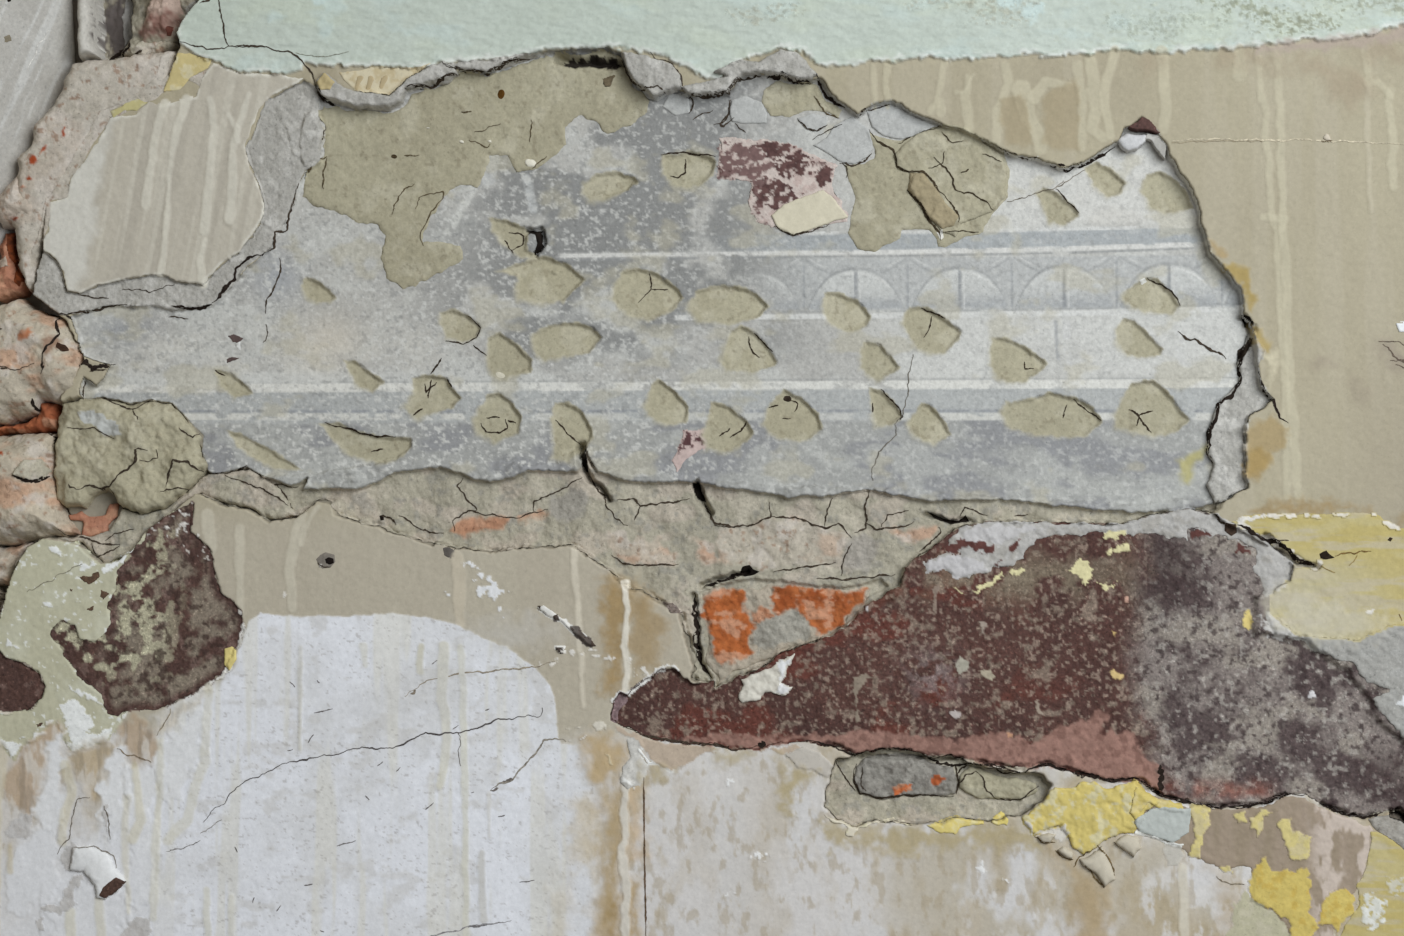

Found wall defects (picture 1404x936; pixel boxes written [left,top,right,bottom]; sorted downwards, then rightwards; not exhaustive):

spalling [121,0,180,57]
spalling [180,0,199,16]
flaking render [33,47,1288,513]
water stain [903,0,1404,496]
crack [691,571,749,678]
crack [405,661,555,697]
peeling [262,452,1404,936]
crack [166,708,564,852]
peeling [59,840,126,899]